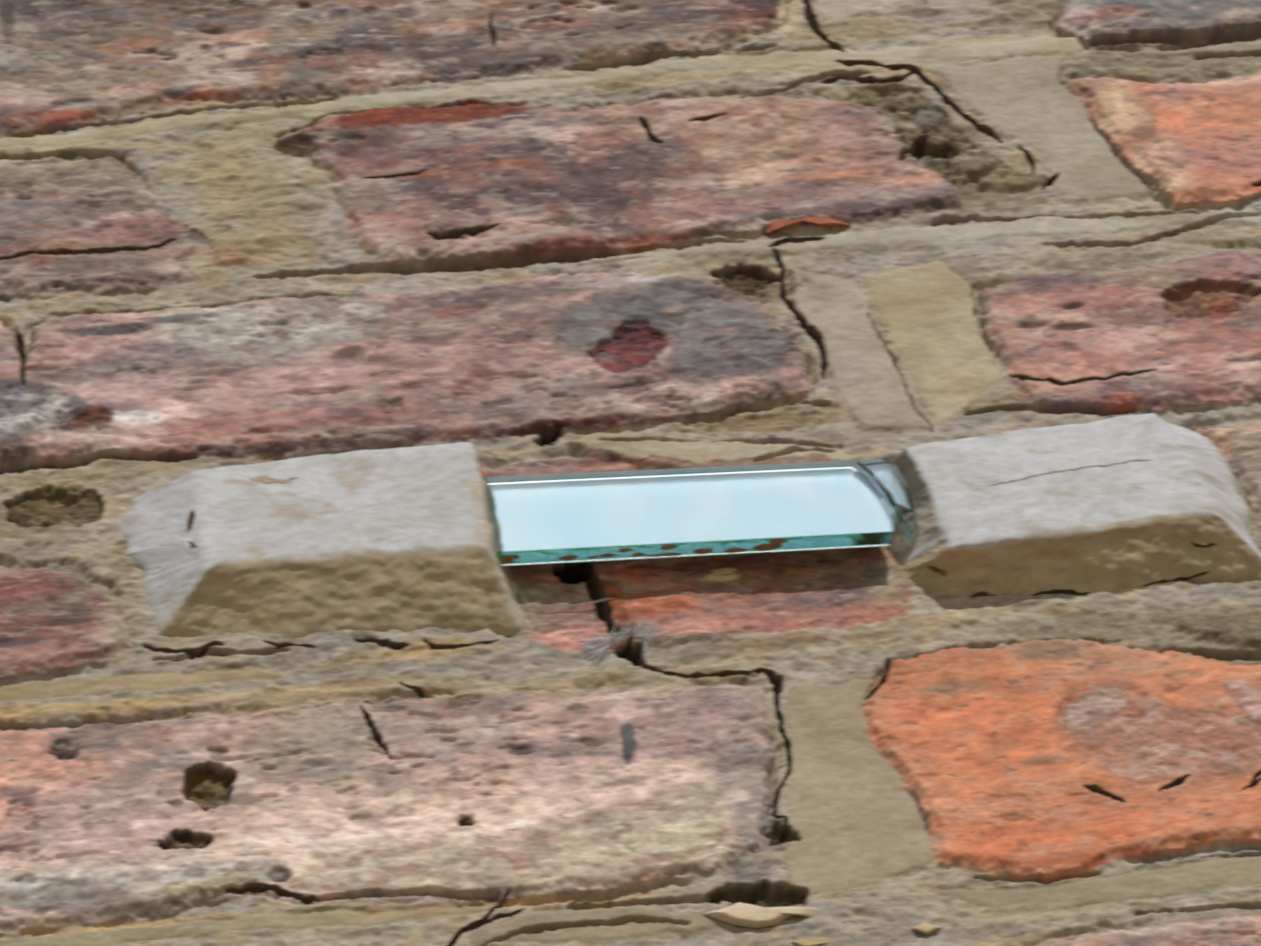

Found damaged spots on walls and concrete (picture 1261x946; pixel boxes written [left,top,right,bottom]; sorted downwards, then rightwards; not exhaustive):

crack [803,0,1061,190]
crack [0,239,177,260]
crack [769,237,828,379]
spalling [588,320,668,372]
crack [1009,369,1157,386]
crack [578,561,792,842]
crack [447,891,525,946]